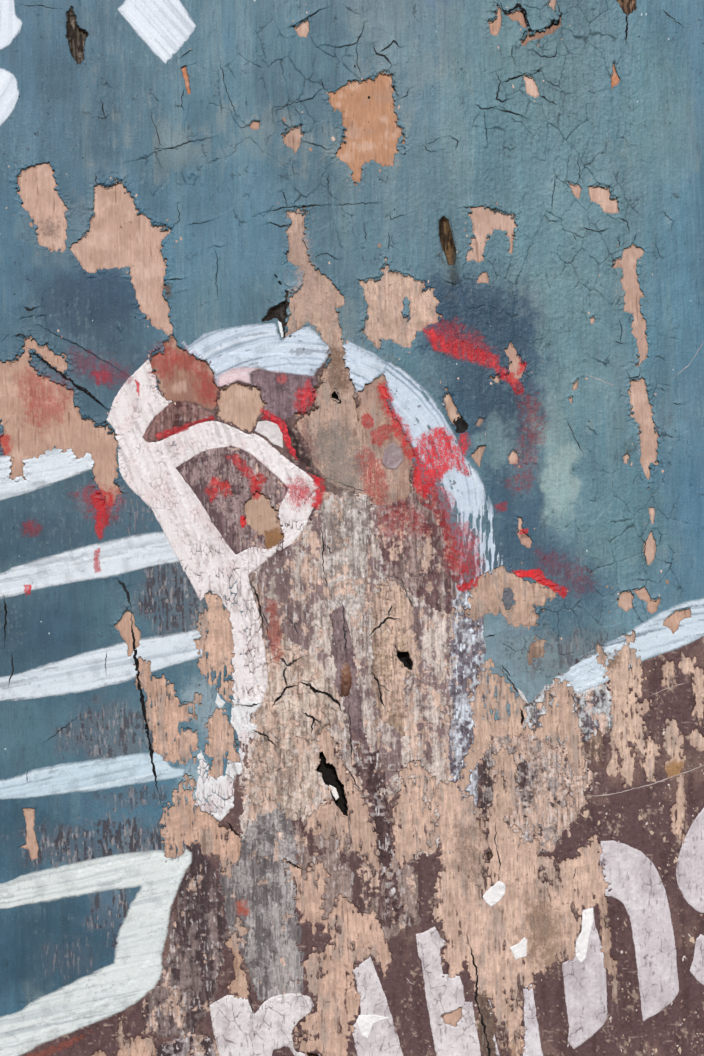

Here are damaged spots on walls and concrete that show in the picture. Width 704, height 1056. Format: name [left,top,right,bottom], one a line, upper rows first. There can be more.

crack [331,26,408,97]
crack [478,3,562,137]
crack [151,115,210,151]
peeling [328,70,406,186]
peeling [16,163,68,253]
crack [165,205,220,298]
crack [269,165,404,249]
crack [546,161,662,257]
peeling [0,335,122,506]
peeling [70,177,704,1056]
crack [118,581,161,802]
peeling [20,808,39,860]